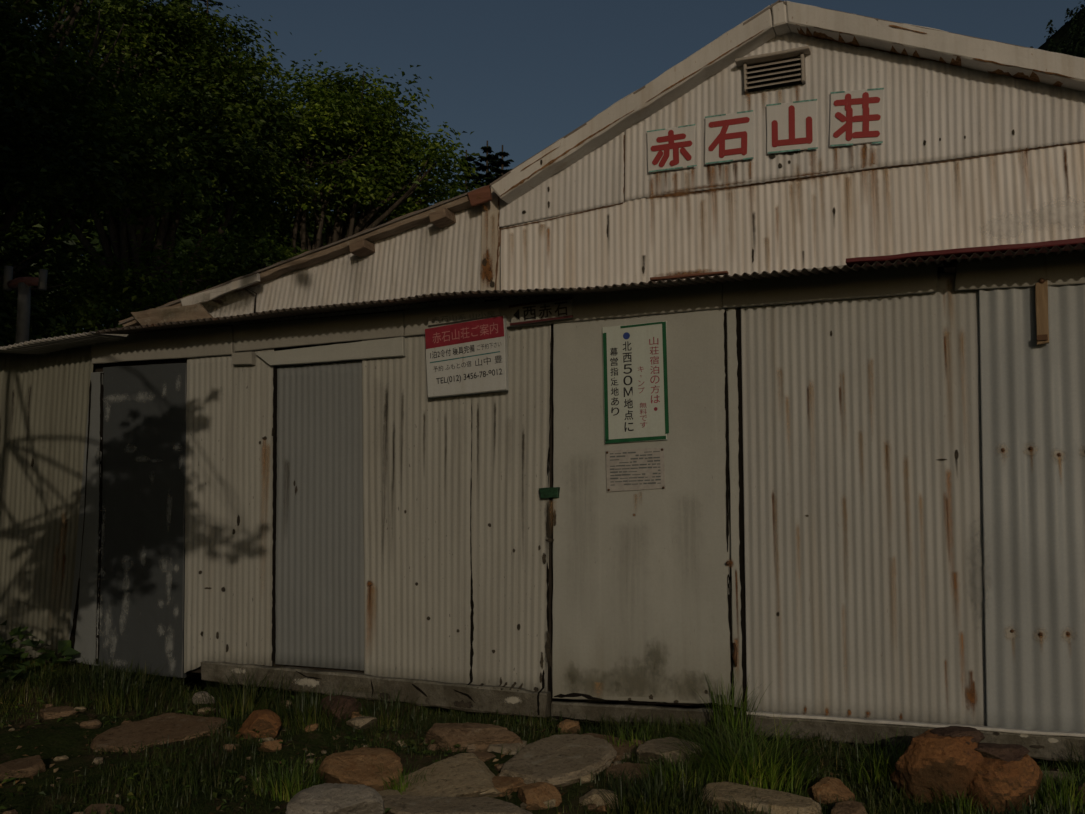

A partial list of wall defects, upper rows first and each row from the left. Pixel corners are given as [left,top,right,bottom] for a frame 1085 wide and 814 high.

rust [796,24,1078,87]
rust [651,162,751,219]
rust [850,143,888,182]
rust [481,250,495,288]
peeling [96,553,146,668]
rust [965,672,975,704]